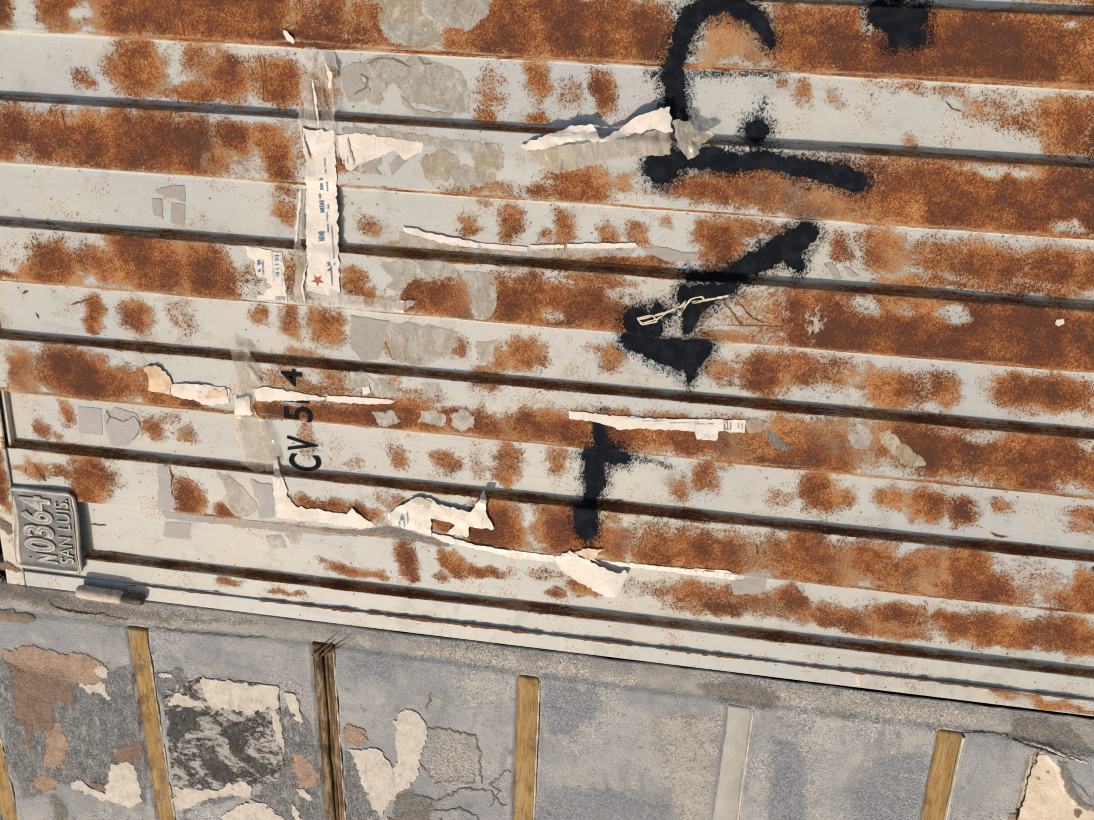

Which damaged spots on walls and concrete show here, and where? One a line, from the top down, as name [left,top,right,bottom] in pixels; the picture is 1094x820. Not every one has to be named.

corrosion [0,0,680,234]
corrosion [338,202,687,333]
corrosion [0,411,274,522]
corrosion [287,489,407,524]
corrosion [391,535,423,585]
corrosion [431,541,522,584]
corrosion [526,565,602,602]
corrosion [366,612,1094,715]
peeling [342,724,368,747]
peeling [386,727,511,820]
crack [963,731,1094,820]
flaking render [1008,752,1094,820]